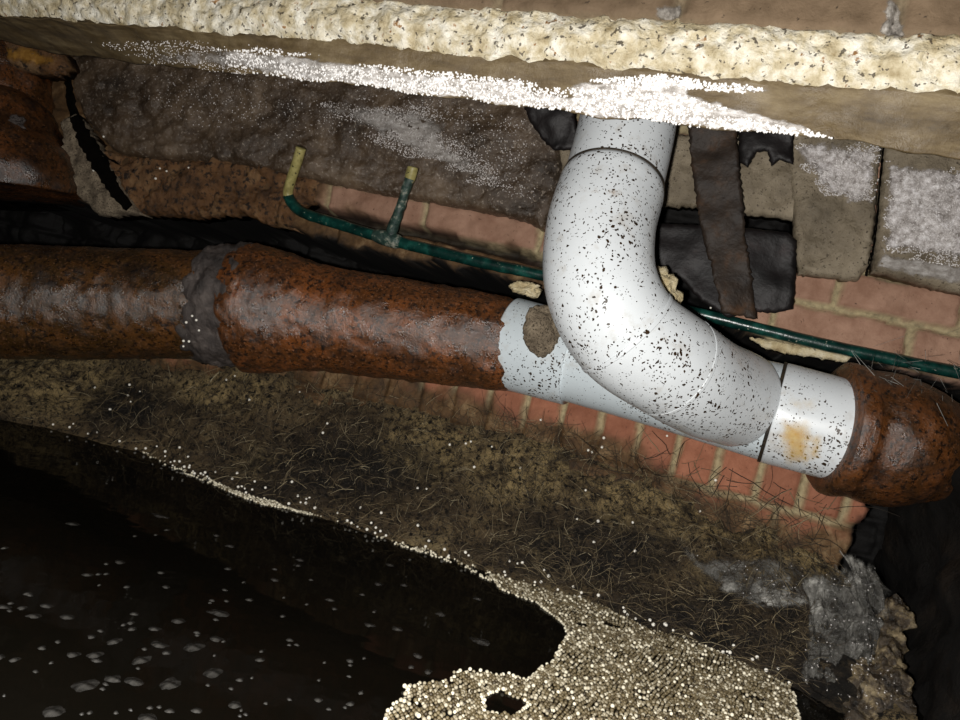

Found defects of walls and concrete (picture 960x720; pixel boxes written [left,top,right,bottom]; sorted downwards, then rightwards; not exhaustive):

crack [64,80,132,211]
water stain [91,40,960,282]